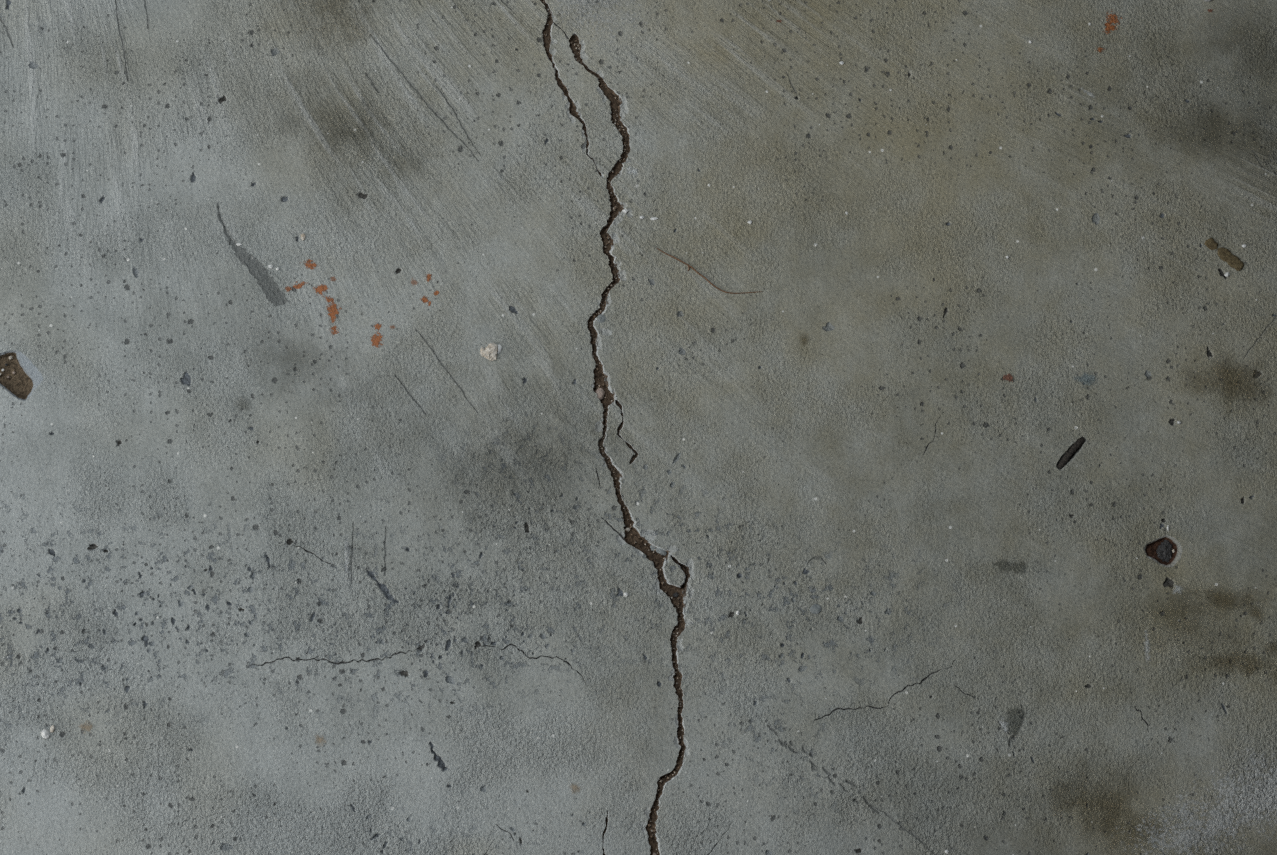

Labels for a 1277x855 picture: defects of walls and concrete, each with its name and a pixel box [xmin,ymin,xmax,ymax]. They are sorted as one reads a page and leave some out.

corrosion [285,259,341,334]
corrosion [371,323,383,348]
crack [540,0,695,855]
crack [248,636,435,666]
crack [477,643,587,685]
crack [706,821,733,855]